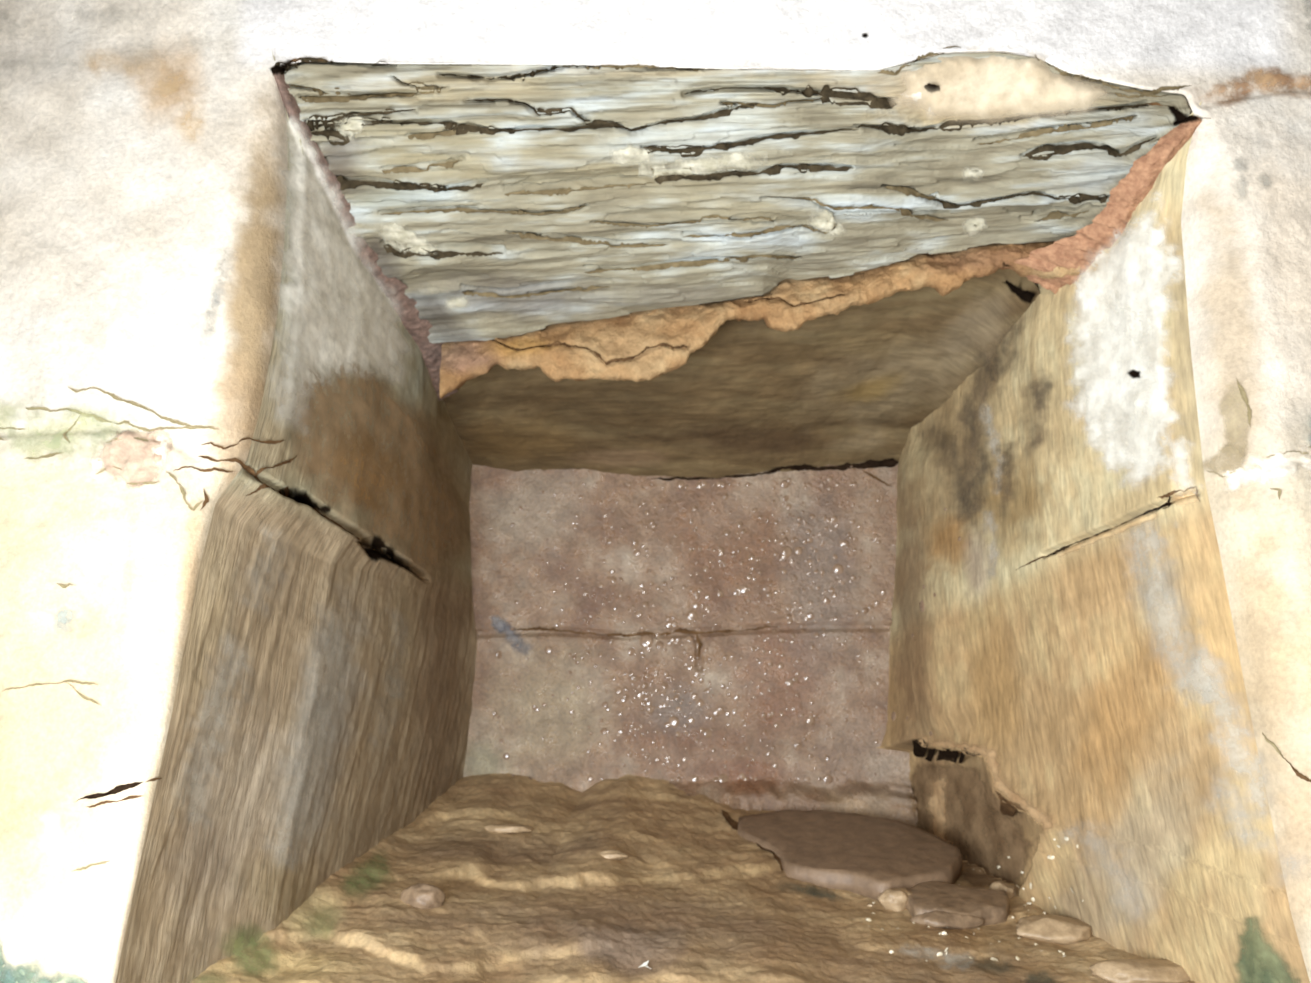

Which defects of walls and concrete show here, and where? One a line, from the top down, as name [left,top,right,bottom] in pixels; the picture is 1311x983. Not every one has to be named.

crack [1034,54,1185,106]
crack [0,386,429,581]
crack [1016,486,1200,570]
crack [75,778,161,808]
flaking render [909,737,1052,887]
crack [1262,733,1311,782]